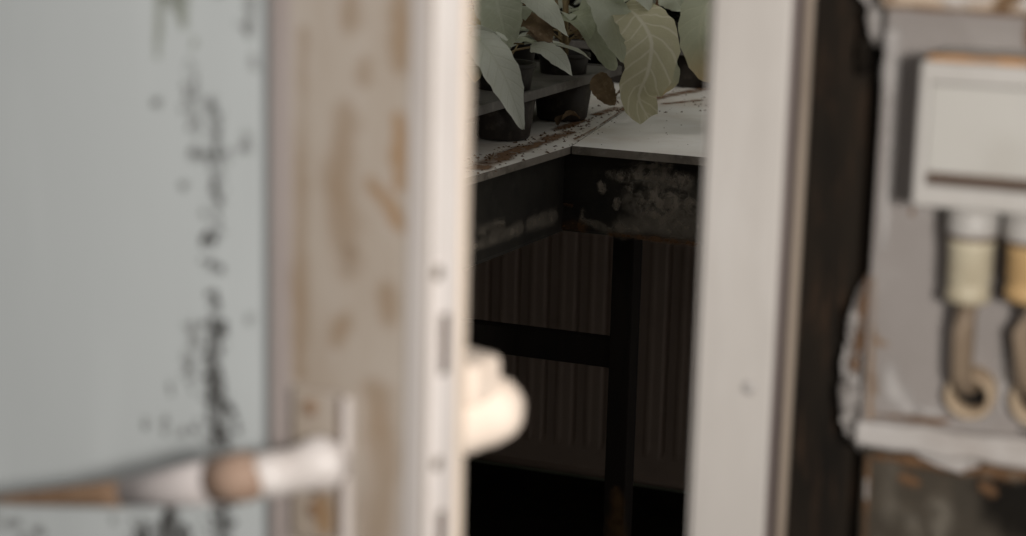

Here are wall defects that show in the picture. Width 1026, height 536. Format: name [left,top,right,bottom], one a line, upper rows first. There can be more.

damp [191,290,241,449]
flaking render [839,271,870,453]
damp [128,503,237,536]
flaking render [914,452,982,473]